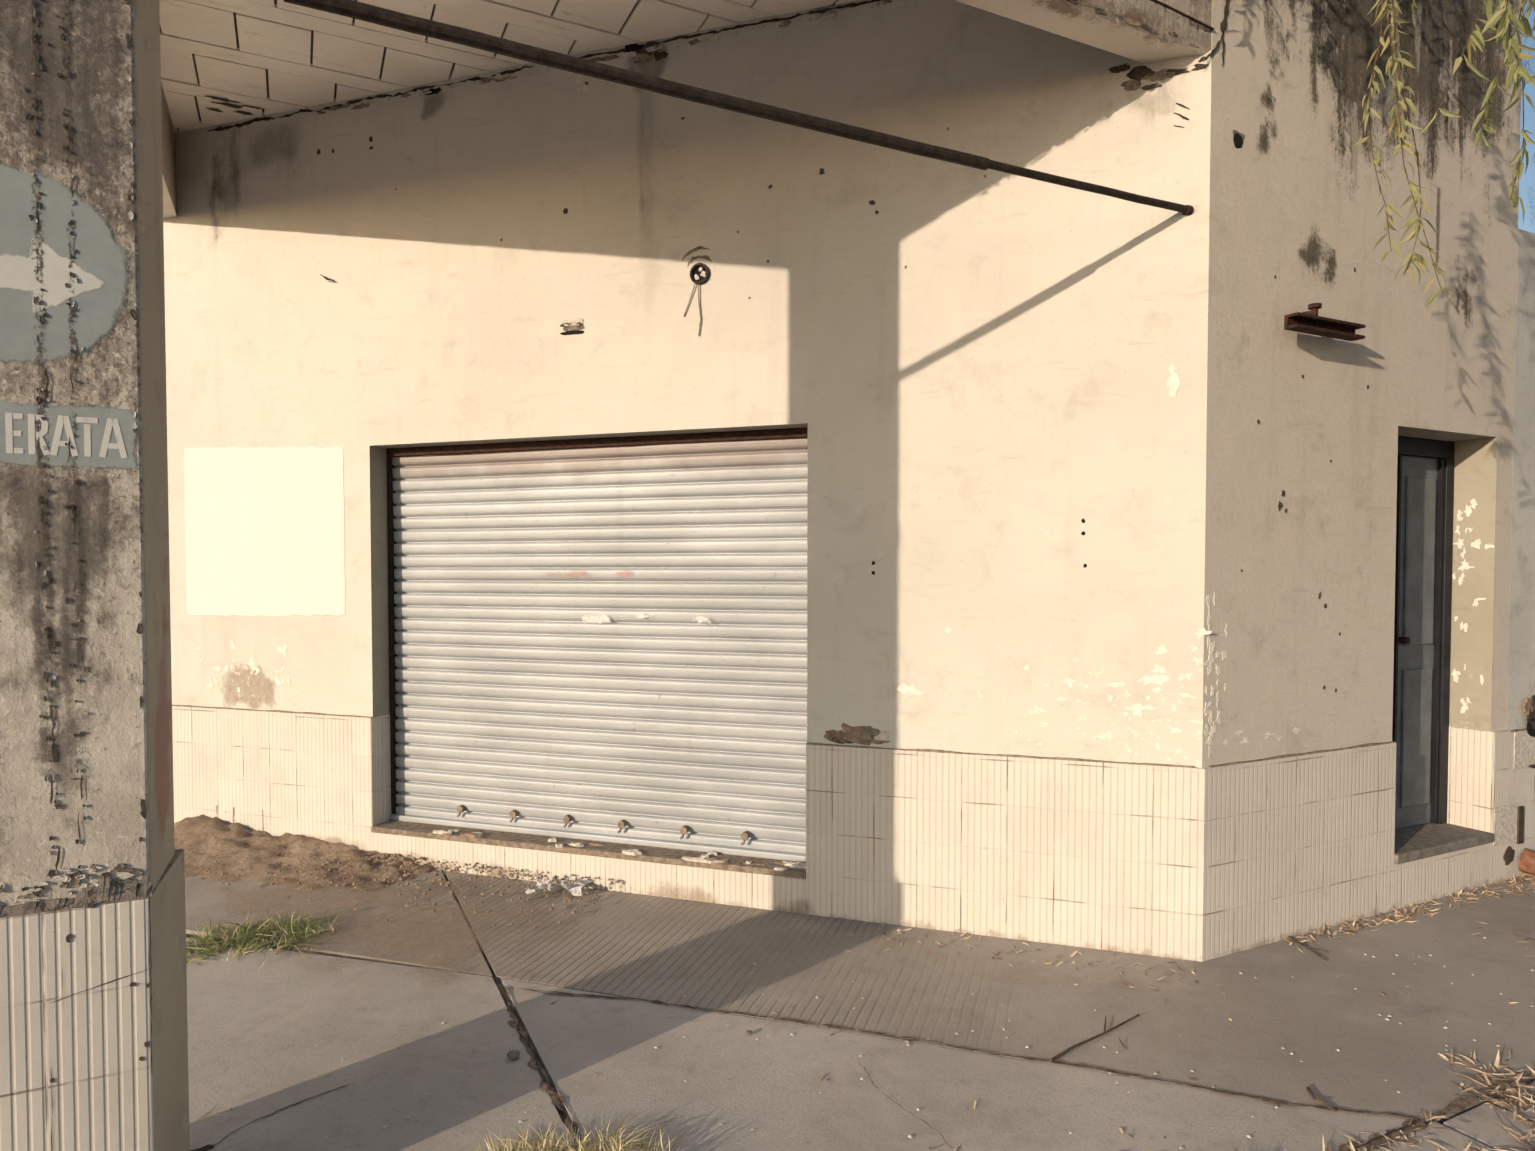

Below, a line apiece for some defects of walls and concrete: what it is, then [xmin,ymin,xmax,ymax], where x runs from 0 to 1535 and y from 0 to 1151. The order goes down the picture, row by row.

damp [0,0,137,175]
spalling [1066,0,1214,91]
damp [1106,0,1208,43]
damp [1258,0,1526,261]
peeling [1453,499,1495,586]
damp [0,466,126,791]
peeling [897,683,924,699]
peeling [1015,591,1301,765]
peeling [1452,664,1484,714]